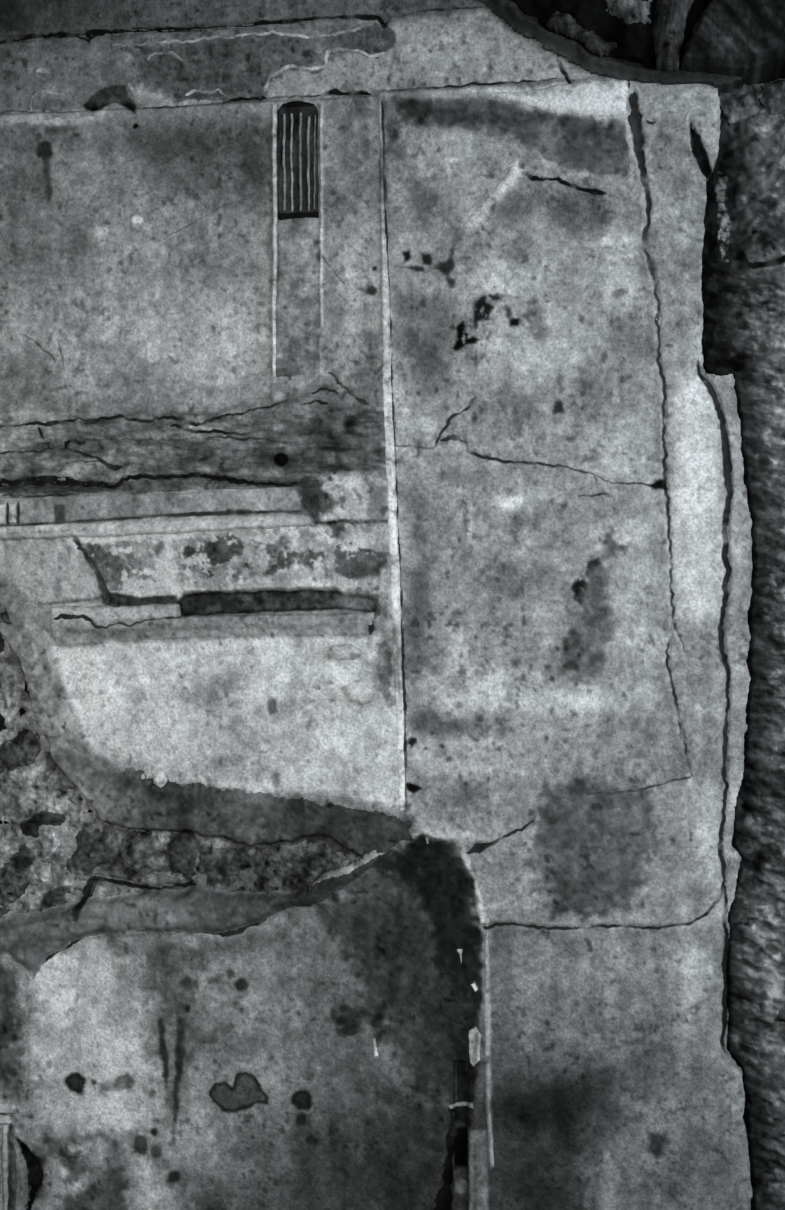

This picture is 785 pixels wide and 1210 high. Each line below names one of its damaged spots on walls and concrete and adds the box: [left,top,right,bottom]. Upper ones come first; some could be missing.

water stain [387,99,628,175]
crack [690,123,714,182]
flaking render [403,248,455,288]
flaking render [453,293,520,366]
crack [0,89,407,805]
crack [435,82,691,795]
peeling [182,478,388,619]
spalling [0,611,363,919]
crack [483,360,733,1052]
water stain [316,835,482,1132]
water stain [65,1072,134,1093]
water stain [209,1072,269,1112]